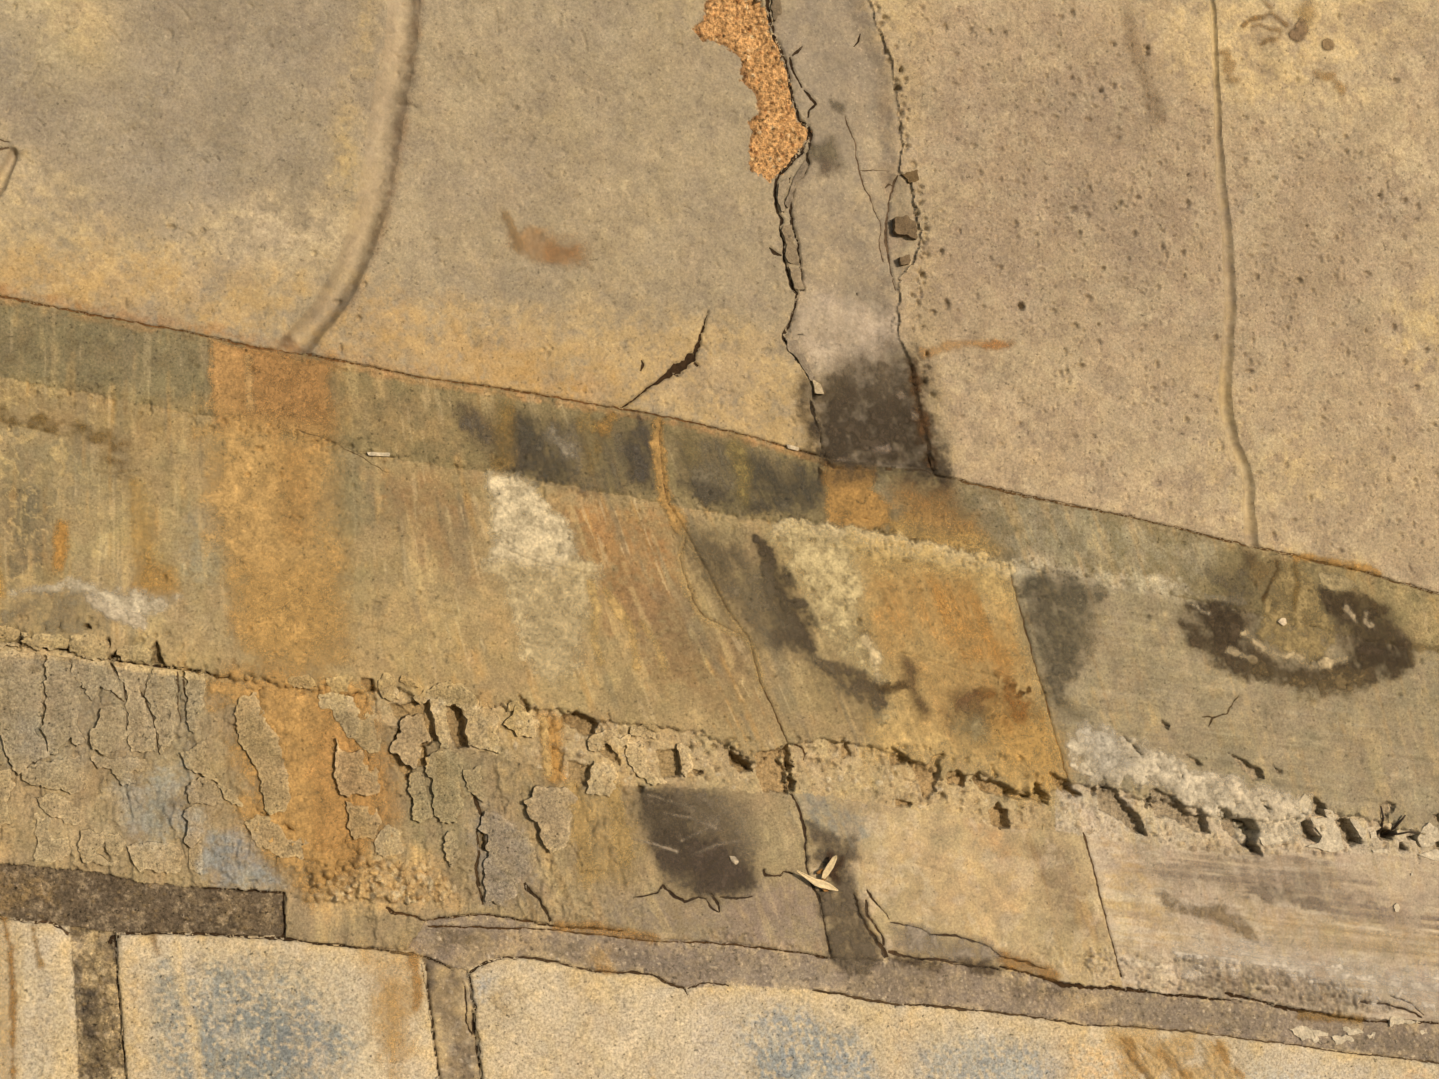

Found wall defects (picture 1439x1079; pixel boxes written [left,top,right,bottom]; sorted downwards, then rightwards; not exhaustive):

spalling [693,0,813,290]
crack [765,0,898,343]
leakage [800,352,951,484]
peeling [0,624,309,875]
peeling [288,672,704,905]
leakage [459,407,665,683]
crack [0,295,1439,1079]
leakage [678,439,1105,724]
spalling [889,748,1284,856]
leakage [1179,554,1413,694]
spalling [1295,793,1439,861]
rust [1,917,16,1047]